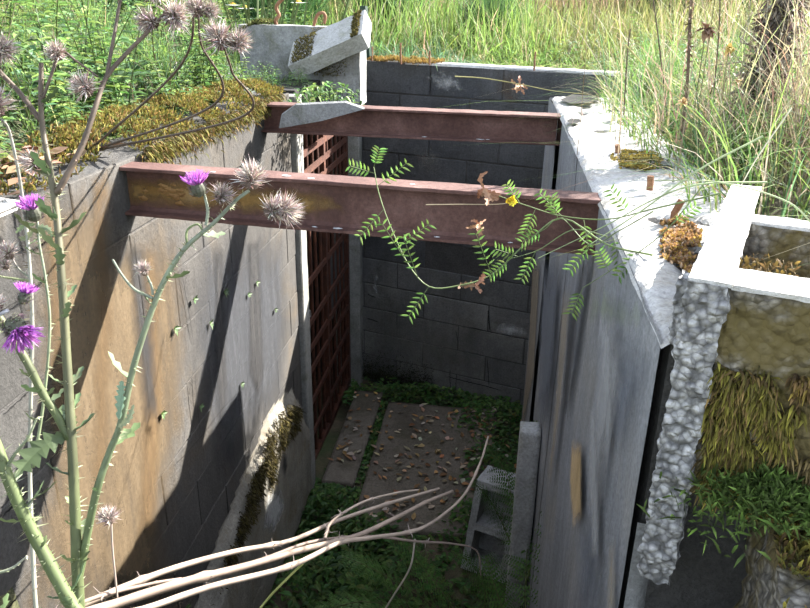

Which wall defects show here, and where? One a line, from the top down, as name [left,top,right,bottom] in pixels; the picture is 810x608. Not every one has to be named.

corrosion [131,183,330,211]
corrosion [570,446,581,522]
water stain [266,496,284,530]